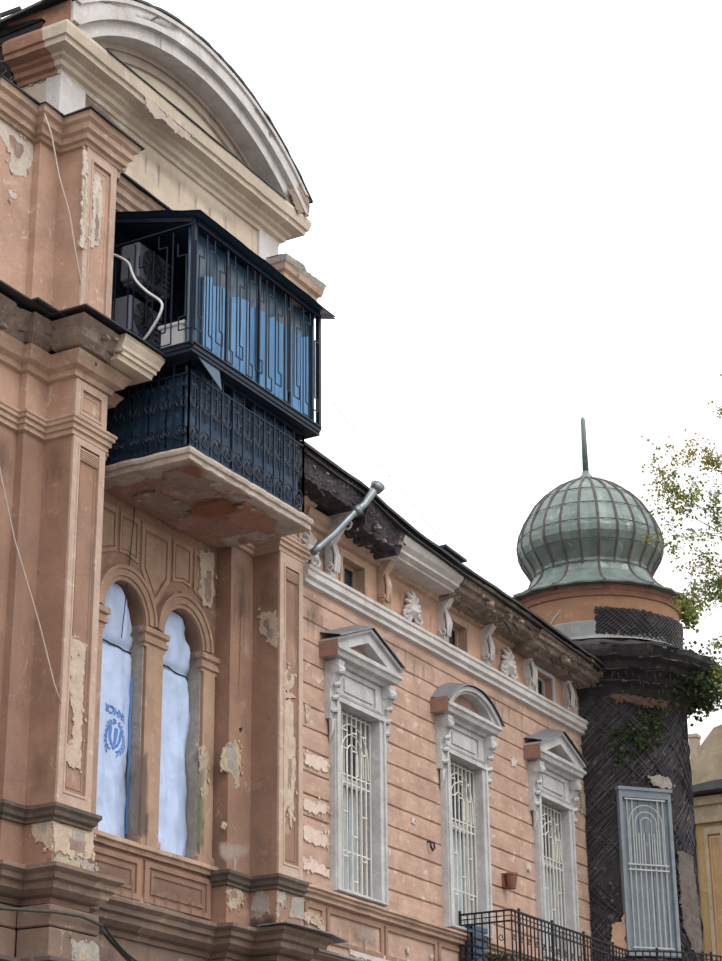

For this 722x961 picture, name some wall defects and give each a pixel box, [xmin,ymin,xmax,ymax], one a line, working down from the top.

peeling [0,119,34,177]
peeling [78,145,103,250]
spalling [226,501,277,536]
peeling [197,549,219,614]
peeling [257,606,279,648]
peeling [66,634,88,773]
peeling [196,738,244,801]
peeling [280,662,332,885]
peeling [29,820,99,872]
peeling [224,888,325,931]
peeling [70,935,100,961]